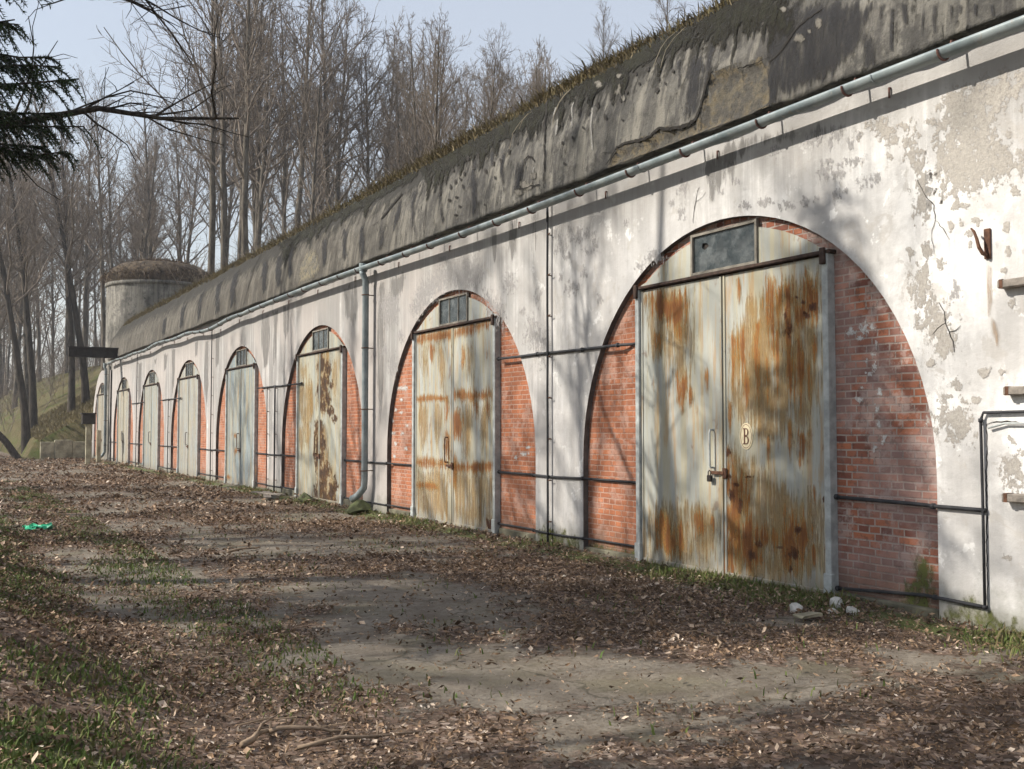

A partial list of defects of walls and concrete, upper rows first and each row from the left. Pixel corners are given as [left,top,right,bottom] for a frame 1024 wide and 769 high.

crack [602,69,711,165]
damp [677,44,715,119]
damp [490,151,534,190]
damp [322,226,365,265]
crack [917,180,949,249]
peeling [905,239,963,368]
crack [933,303,959,348]
peeling [977,367,1005,378]
rust [299,352,339,501]
rust [416,321,493,529]
rust [644,269,825,586]
peeling [924,375,981,457]